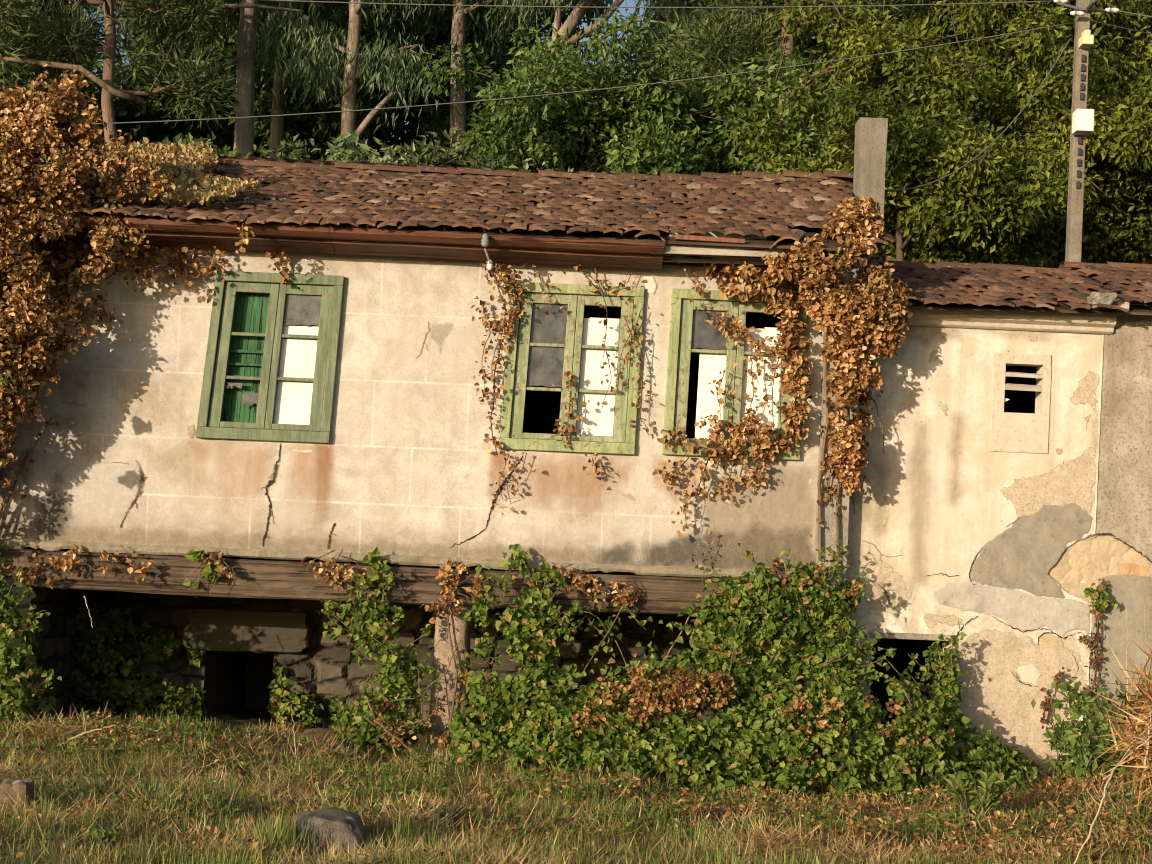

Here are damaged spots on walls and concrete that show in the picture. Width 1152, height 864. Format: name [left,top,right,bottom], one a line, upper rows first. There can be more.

leakage [12,475,70,539]
crack [114,461,147,528]
crack [262,444,281,546]
peeling [1000,443,1097,527]
peeling [856,560,916,618]
flaking render [1049,533,1152,603]
peeling [924,614,1088,758]